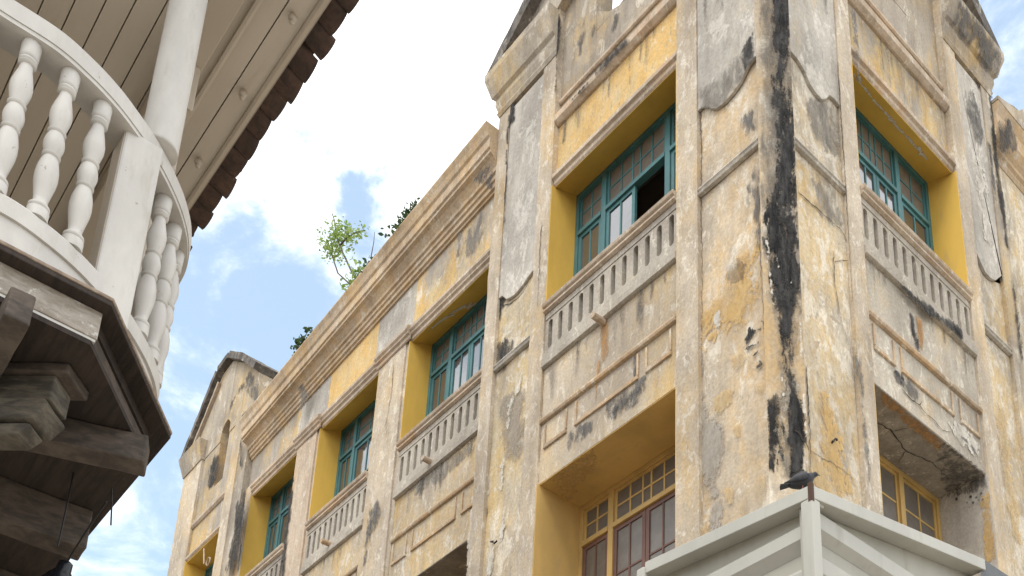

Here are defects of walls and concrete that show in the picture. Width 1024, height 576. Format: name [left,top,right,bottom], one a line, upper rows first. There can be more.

leakage [965,80,1018,248]
leakage [700,0,807,478]
peeling [701,240,779,376]
leakage [898,281,963,349]
leakage [208,455,220,488]
leakage [225,490,246,571]
leakage [606,355,646,420]
peeling [701,389,741,535]
crack [877,389,951,481]
spalling [882,395,995,562]